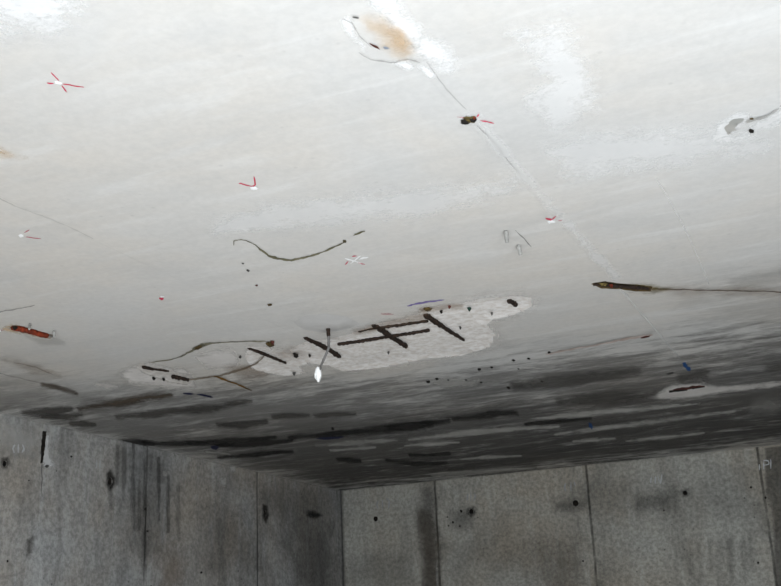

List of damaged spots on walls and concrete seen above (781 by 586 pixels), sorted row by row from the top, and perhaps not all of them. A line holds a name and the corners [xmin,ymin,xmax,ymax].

crack [371,0,455,72]
crack [233,231,365,261]
spalling [196,295,532,376]
leakage [42,383,77,395]
spalling [121,363,195,388]
leakage [511,369,634,388]
leakage [23,394,251,427]
leakage [123,394,737,476]